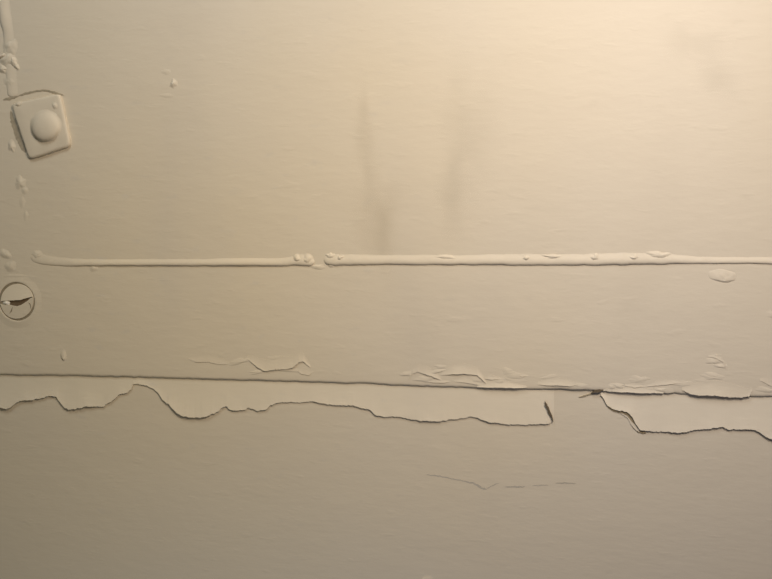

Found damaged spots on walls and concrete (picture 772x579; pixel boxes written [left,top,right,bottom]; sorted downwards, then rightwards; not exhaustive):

peeling [0,353,589,425]
peeling [600,353,772,439]